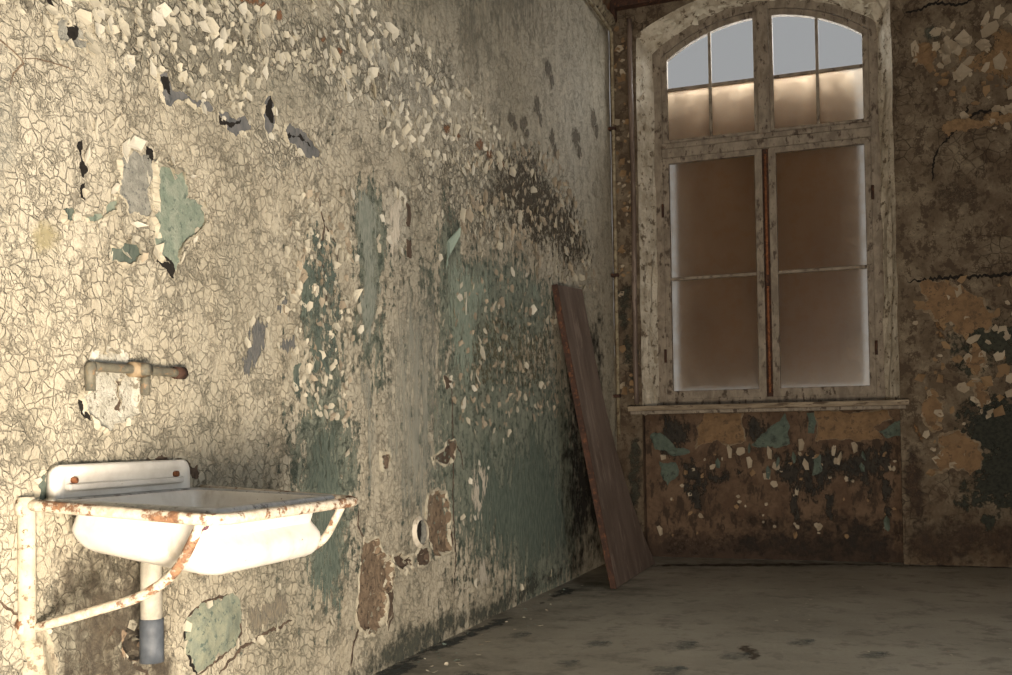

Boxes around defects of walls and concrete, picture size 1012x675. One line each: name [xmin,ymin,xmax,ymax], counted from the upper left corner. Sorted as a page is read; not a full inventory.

crack [0,39,73,90]
peeling [911,4,1012,136]
peeling [60,135,209,282]
water stain [460,95,600,292]
peeling [242,180,412,495]
peeling [299,227,567,666]
water stain [354,372,599,675]
water stain [618,285,632,368]
water stain [655,415,743,511]
water stain [711,391,1012,565]
peeling [912,275,1012,477]